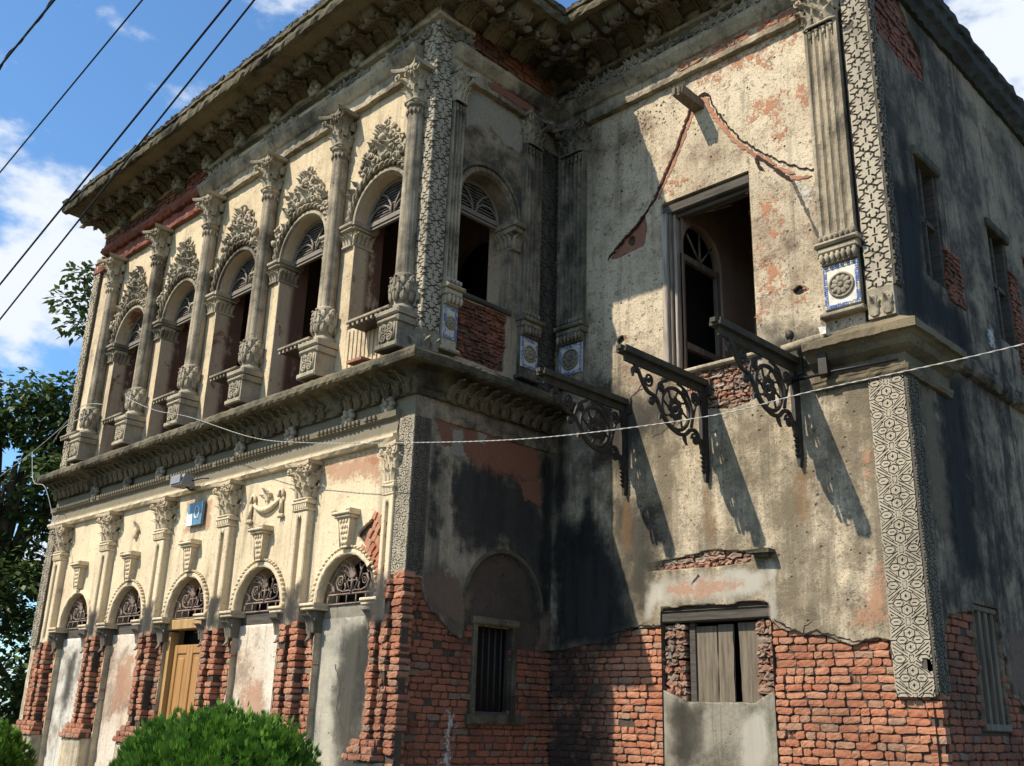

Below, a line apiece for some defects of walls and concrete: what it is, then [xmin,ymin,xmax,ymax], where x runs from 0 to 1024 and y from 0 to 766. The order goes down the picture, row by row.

flaking render [472,26,555,99]
flaking render [677,7,801,87]
peeling [740,74,809,151]
crack [608,92,819,259]
peeling [749,188,809,324]
flaking render [1006,256,1024,375]
flaking render [433,417,543,507]
water stain [428,434,775,652]
flaking render [653,550,752,599]
peeling [241,680,264,717]
flaking render [341,510,669,766]
flaking render [771,566,1024,766]